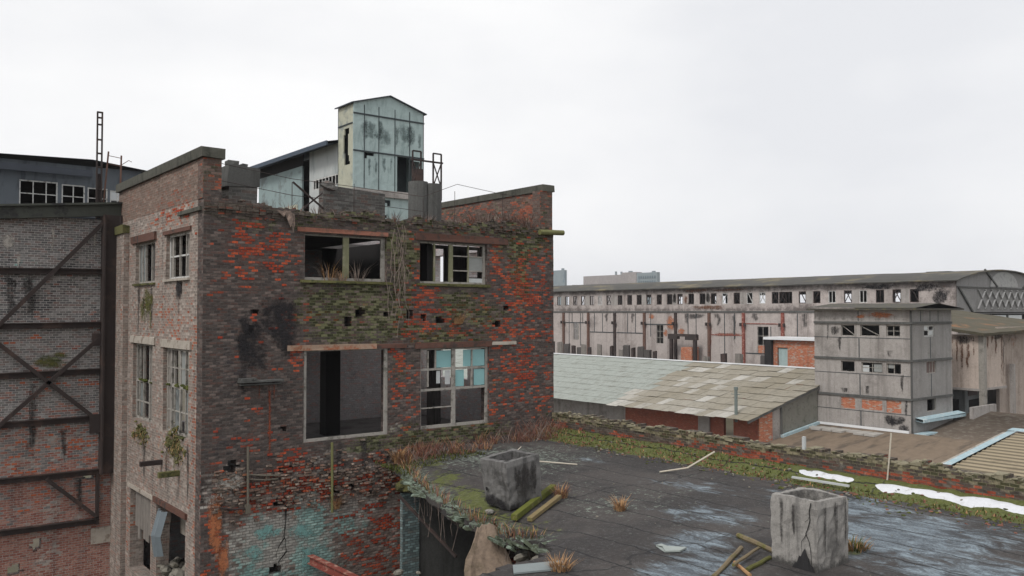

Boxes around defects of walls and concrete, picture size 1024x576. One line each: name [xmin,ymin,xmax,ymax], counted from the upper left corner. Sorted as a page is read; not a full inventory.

water stain [238,318,266,393]
spalling [333,502,400,566]
crack [801,503,812,567]